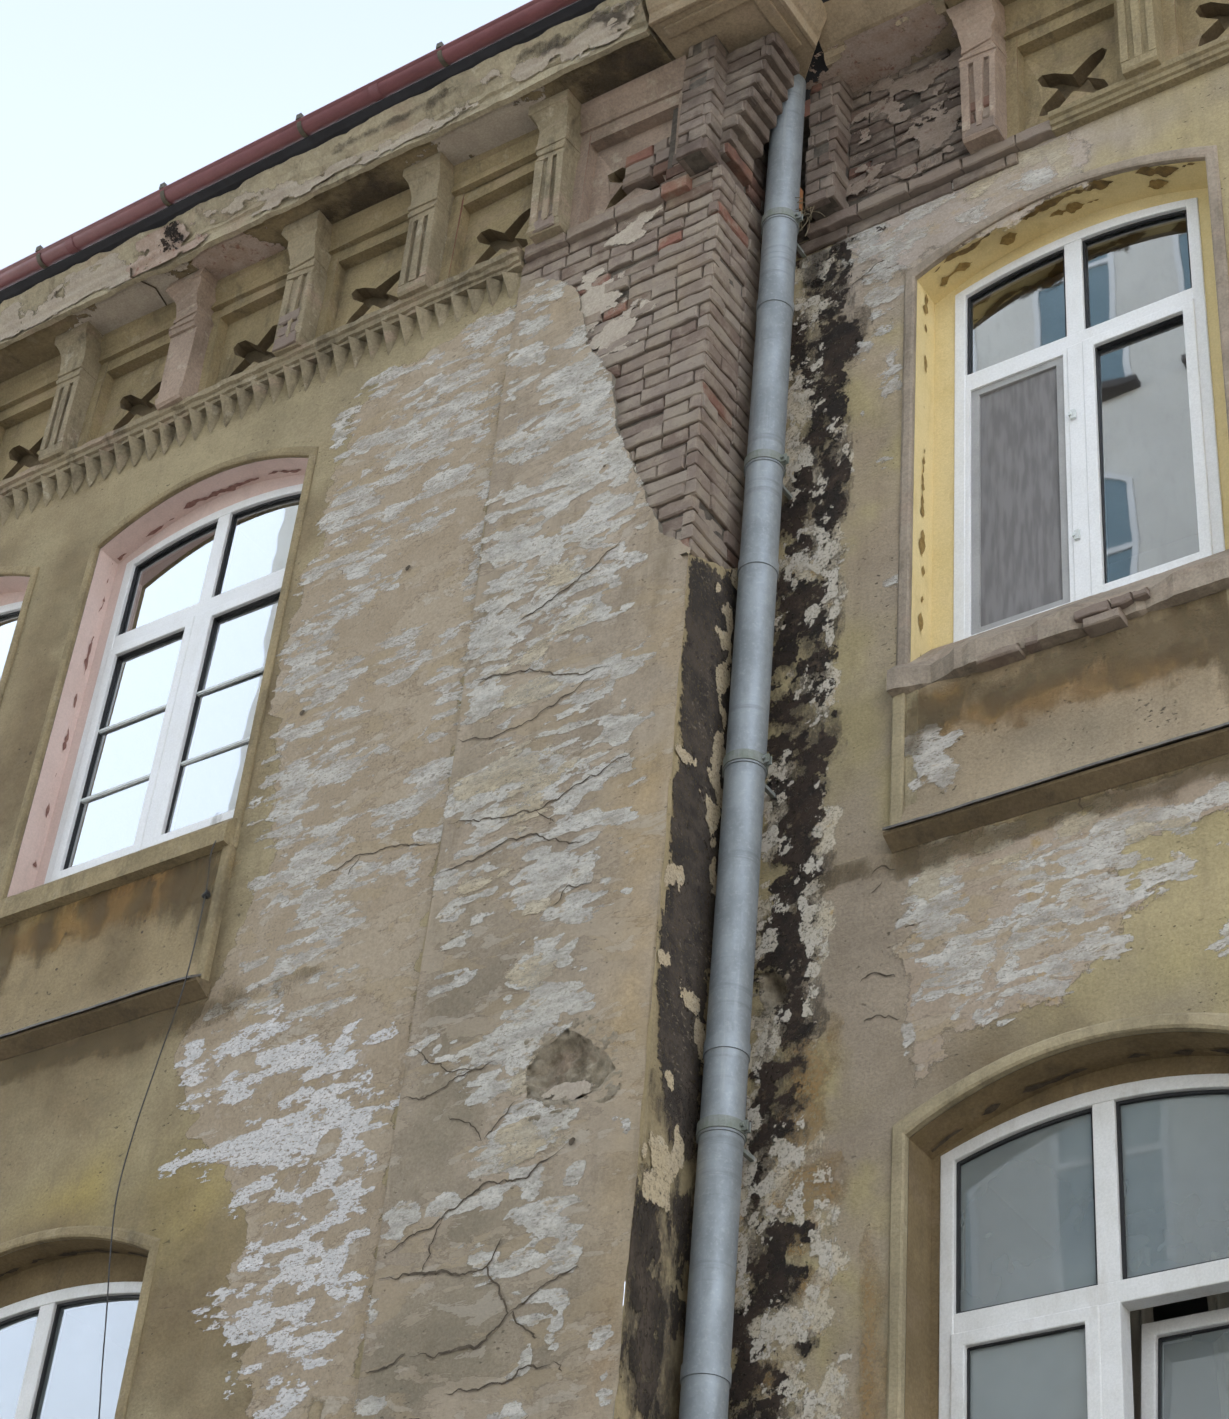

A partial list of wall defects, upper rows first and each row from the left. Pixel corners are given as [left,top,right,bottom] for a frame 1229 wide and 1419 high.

spalling [1136,163,1195,189]
crack [404,1047,515,1141]
crack [326,748,636,876]
crack [459,666,603,742]
peeling [173,1,1113,1419]
damp [618,553,738,1419]
damp [728,226,886,1419]
damp [891,752,1229,876]
peeling [892,770,1229,1088]
crack [366,1143,579,1395]